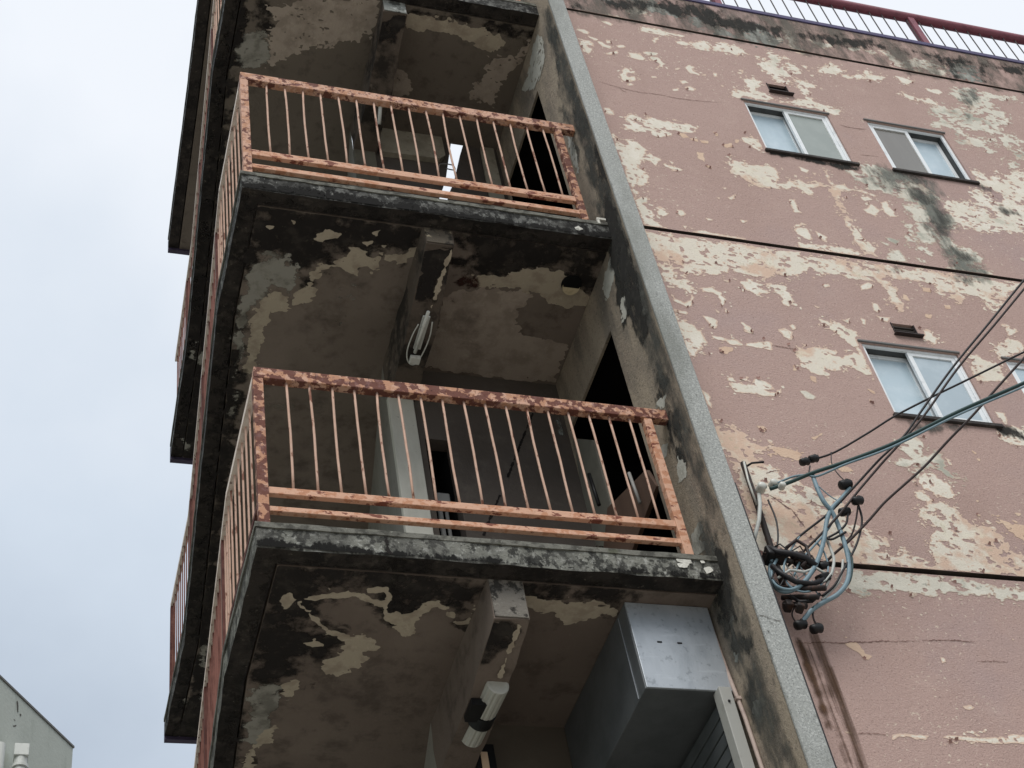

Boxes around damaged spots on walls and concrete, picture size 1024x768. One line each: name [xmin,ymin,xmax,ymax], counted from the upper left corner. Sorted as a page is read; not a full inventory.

peeling [392,69,413,97]
peeling [405,13,545,108]
water stain [571,0,1024,94]
peeling [576,0,1024,404]
water stain [871,167,988,282]
peeling [229,229,416,378]
water stain [171,0,714,737]
peeling [425,250,590,382]
peeling [702,390,1024,609]
peeling [280,586,476,677]
water stain [249,522,791,768]
peeling [525,596,618,625]